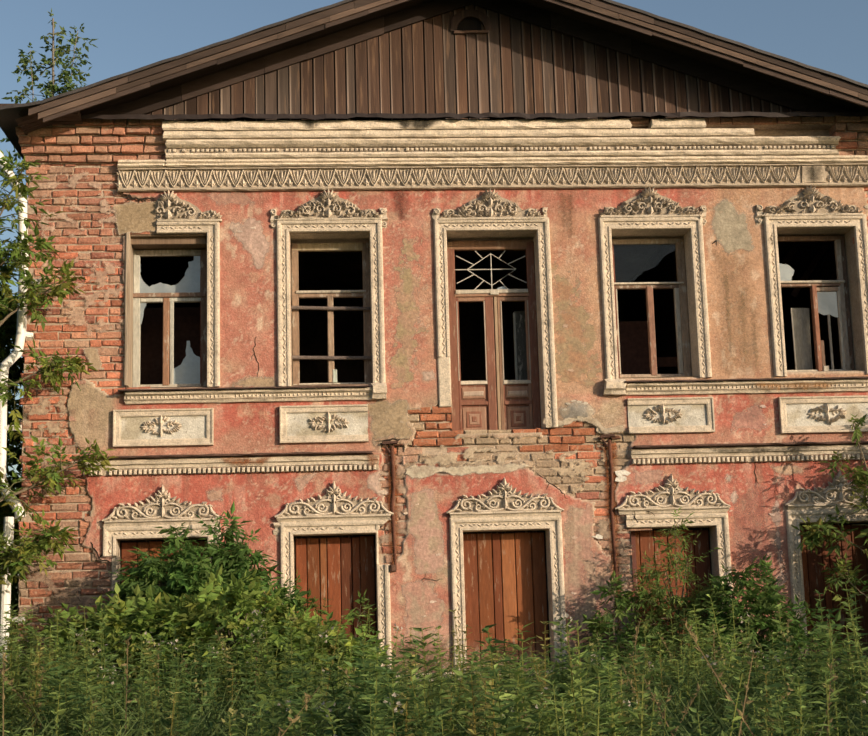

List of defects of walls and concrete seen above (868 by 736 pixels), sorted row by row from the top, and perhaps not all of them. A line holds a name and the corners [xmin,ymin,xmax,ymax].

peeling [712,200,754,254]
peeling [390,237,436,388]
peeling [551,263,602,388]
flaking render [16,164,157,662]
flaking render [368,400,662,661]
rust [605,446,616,507]